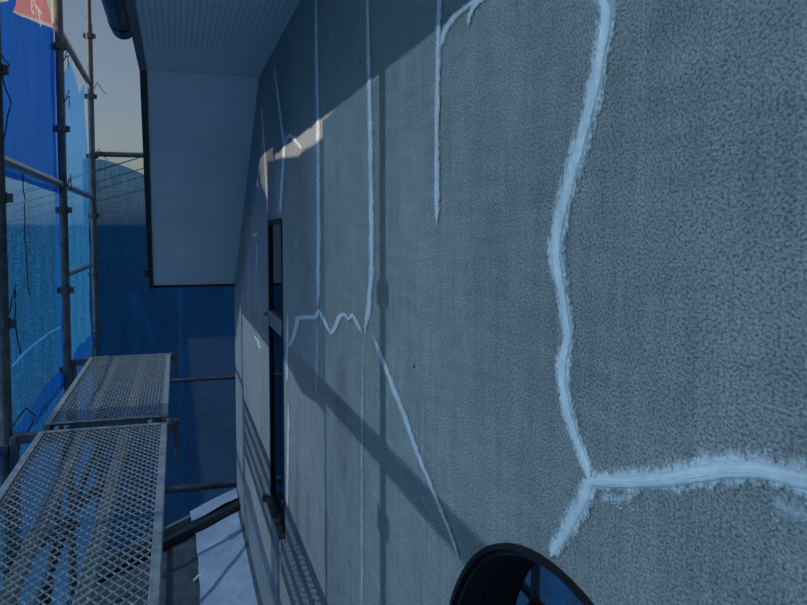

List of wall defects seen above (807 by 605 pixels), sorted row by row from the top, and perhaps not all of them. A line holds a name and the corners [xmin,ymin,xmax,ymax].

crack [434,0,484,221]
crack [242,233,261,369]
crack [261,0,459,558]
crack [547,0,807,557]
crack [358,374,366,605]